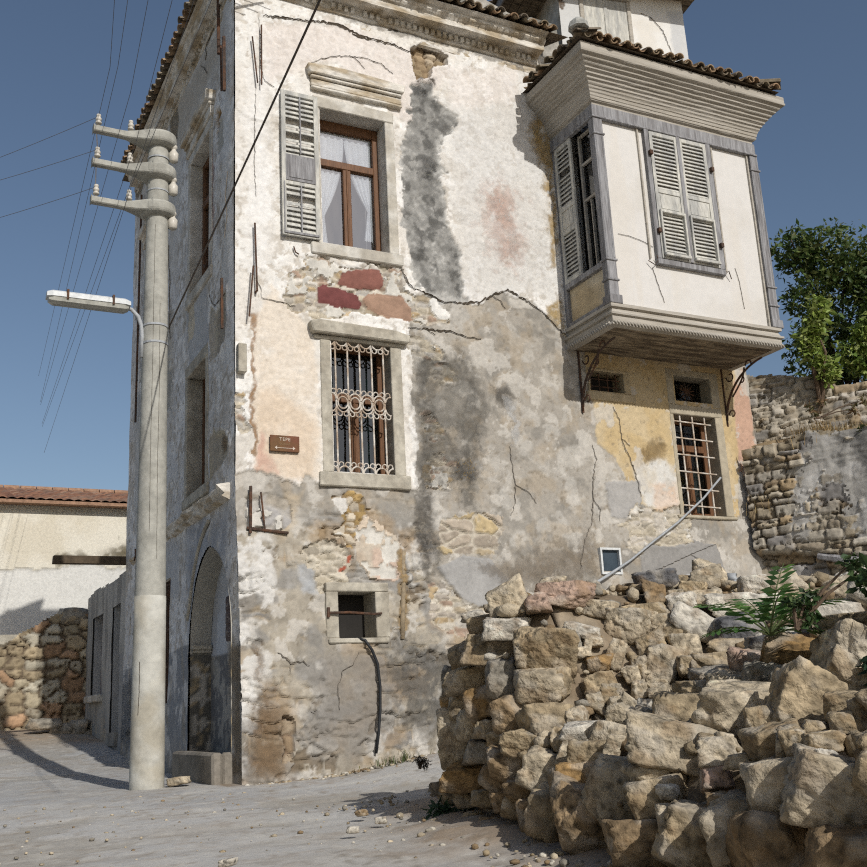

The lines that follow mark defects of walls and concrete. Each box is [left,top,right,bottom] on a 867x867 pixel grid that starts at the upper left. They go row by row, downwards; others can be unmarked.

crack [254,14,410,197]
spalling [282,254,459,387]
crack [408,327,477,339]
crack [402,270,566,335]
spalling [245,492,293,531]
peeling [300,490,403,594]
spalling [431,512,505,555]